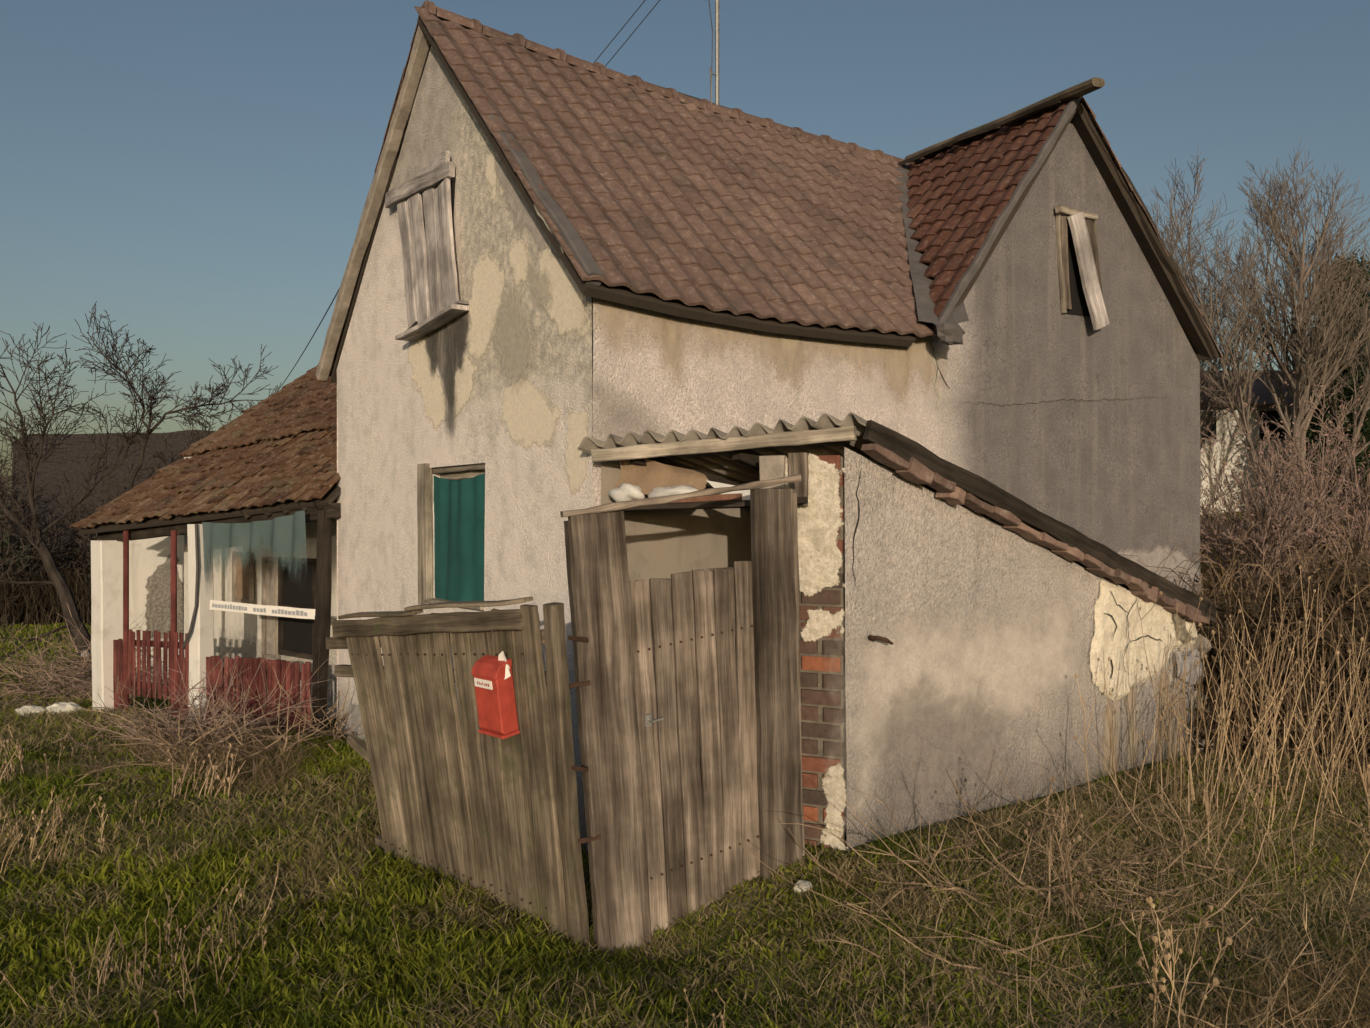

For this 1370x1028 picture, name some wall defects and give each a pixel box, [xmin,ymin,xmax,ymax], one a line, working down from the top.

peeling [408,153,591,428]
water stain [425,314,469,430]
peeling [501,377,589,493]
crack [853,471,861,582]
peeling [145,554,184,640]
spalling [797,453,850,851]